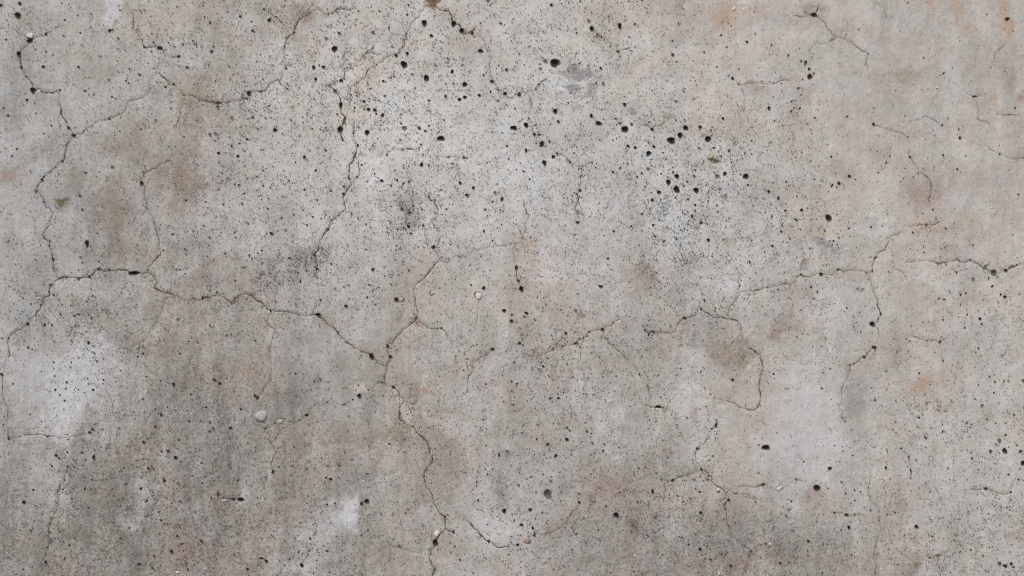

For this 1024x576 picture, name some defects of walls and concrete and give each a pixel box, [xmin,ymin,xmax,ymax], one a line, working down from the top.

crack [0,8,588,576]
crack [523,313,766,571]
crack [643,116,1023,422]